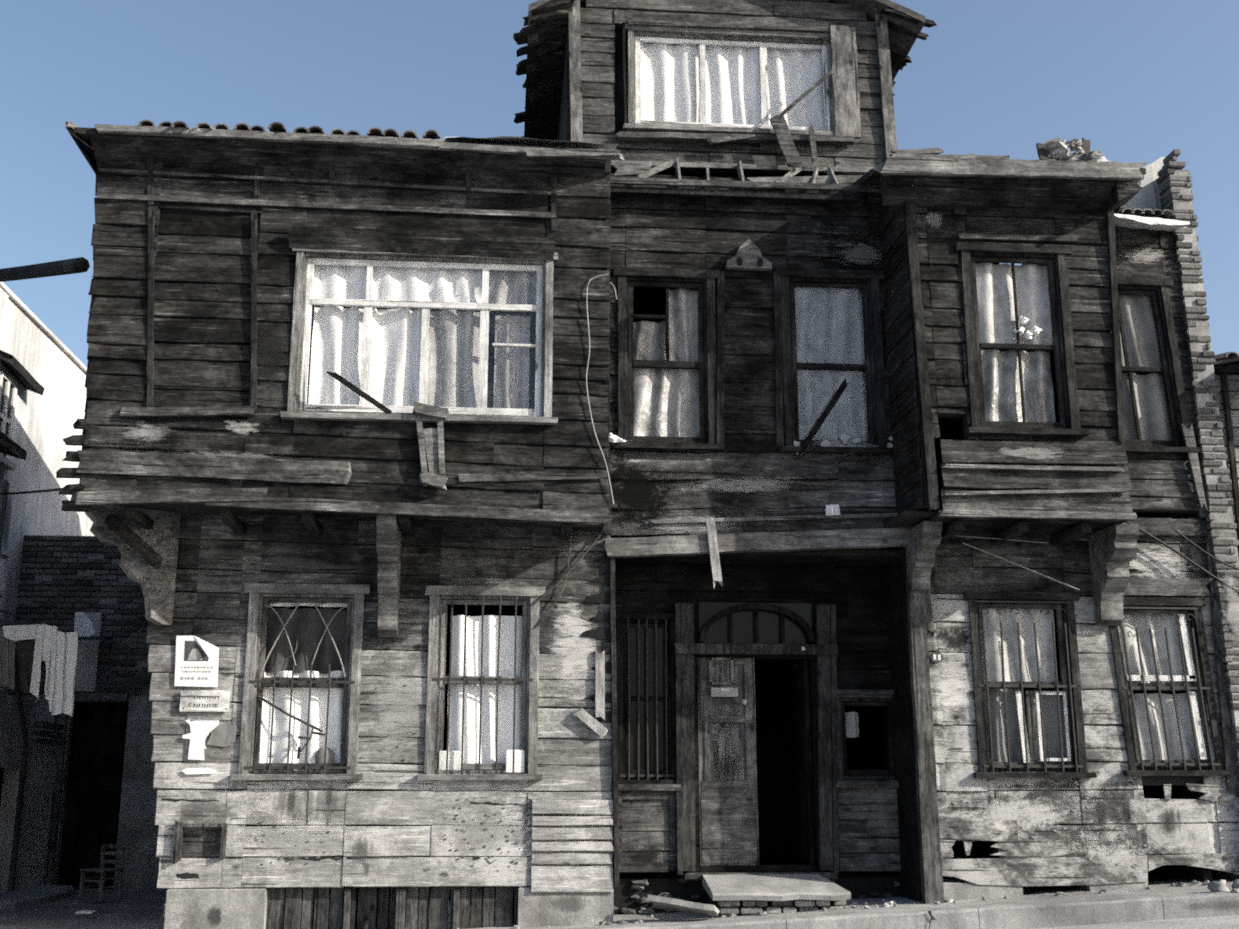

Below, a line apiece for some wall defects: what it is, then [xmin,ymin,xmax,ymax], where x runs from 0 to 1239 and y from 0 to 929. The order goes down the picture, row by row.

water stain [1025,788,1058,805]
water stain [1089,784,1131,831]
water stain [1160,810,1180,832]